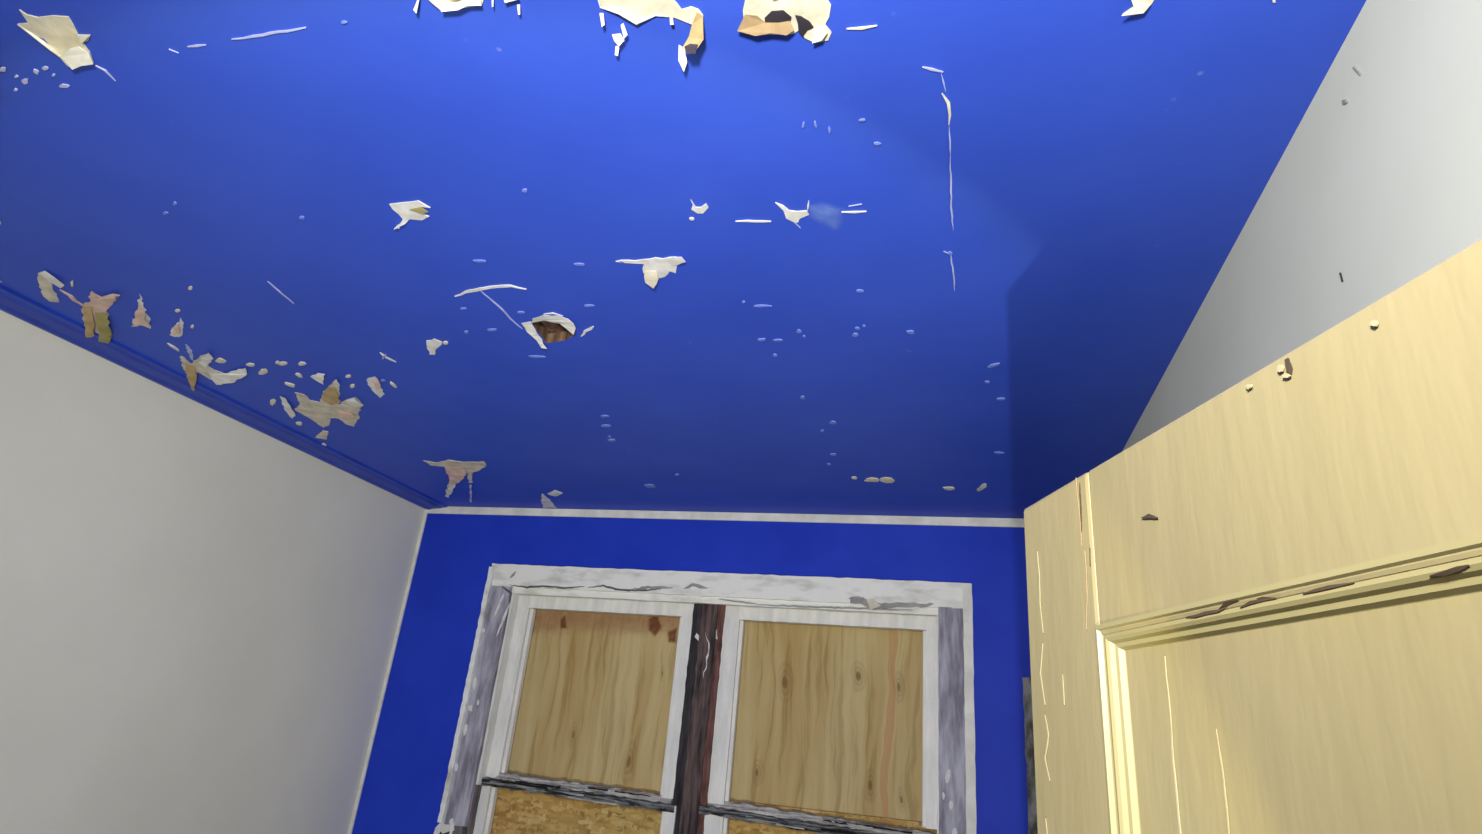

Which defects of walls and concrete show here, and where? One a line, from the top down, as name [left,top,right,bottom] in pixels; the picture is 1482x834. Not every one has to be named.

peeling [0,9,116,91]
peeling [413,0,520,15]
peeling [598,0,704,72]
peeling [737,0,832,43]
peeling [1122,0,1154,16]
peeling [389,200,430,229]
peeling [37,271,120,344]
flaking render [517,311,594,358]
peeling [615,256,686,288]
peeling [167,309,397,446]
crack [1164,656,1182,834]
crack [1216,729,1230,834]